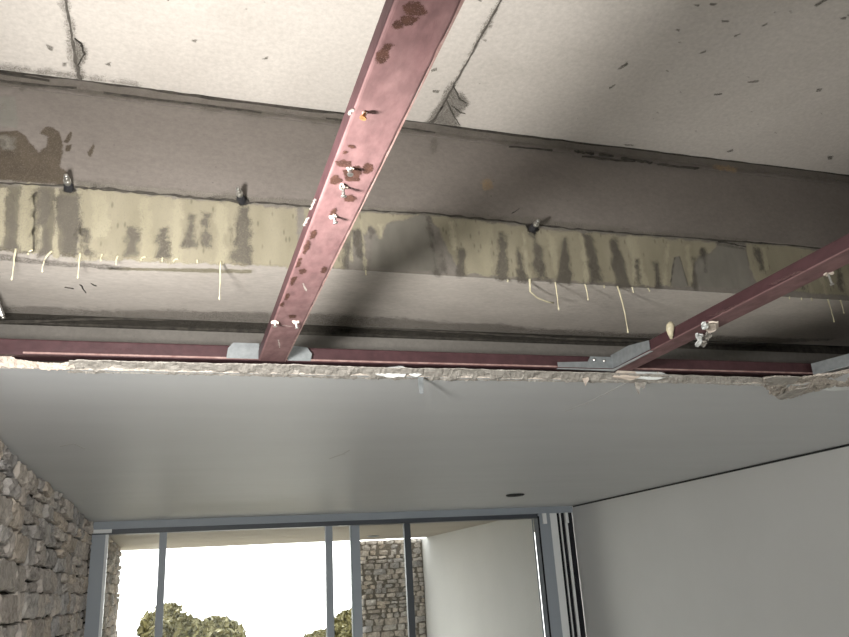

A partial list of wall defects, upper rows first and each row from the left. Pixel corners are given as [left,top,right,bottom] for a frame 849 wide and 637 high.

corrosion [391,1,427,29]
crack [0,0,345,125]
corrosion [375,43,395,64]
crack [400,0,849,185]
corrosion [330,145,374,185]
water stain [0,126,309,300]
water stain [0,305,272,331]
corrosion [280,230,317,307]
water stain [301,211,717,344]
water stain [746,243,815,282]
water stain [789,264,849,322]
flaking render [0,356,849,400]